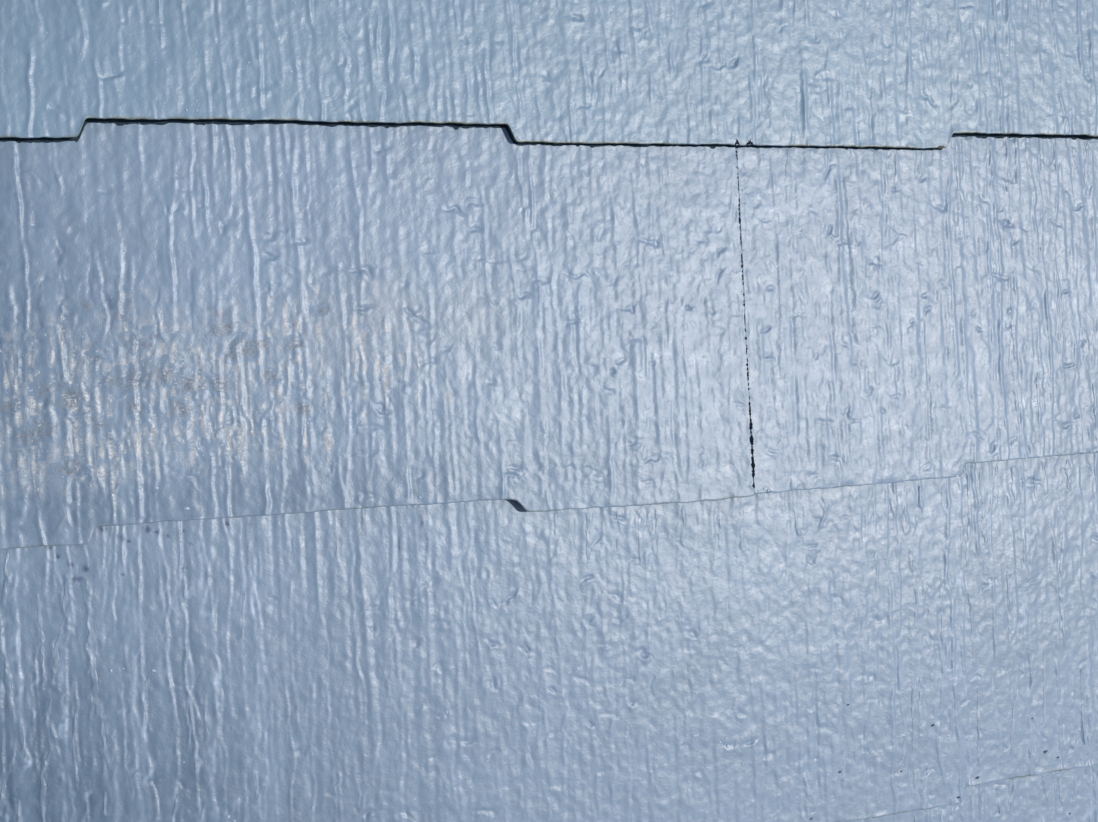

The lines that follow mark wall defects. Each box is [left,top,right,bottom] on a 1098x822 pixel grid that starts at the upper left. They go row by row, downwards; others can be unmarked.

crack [736,146,755,488]